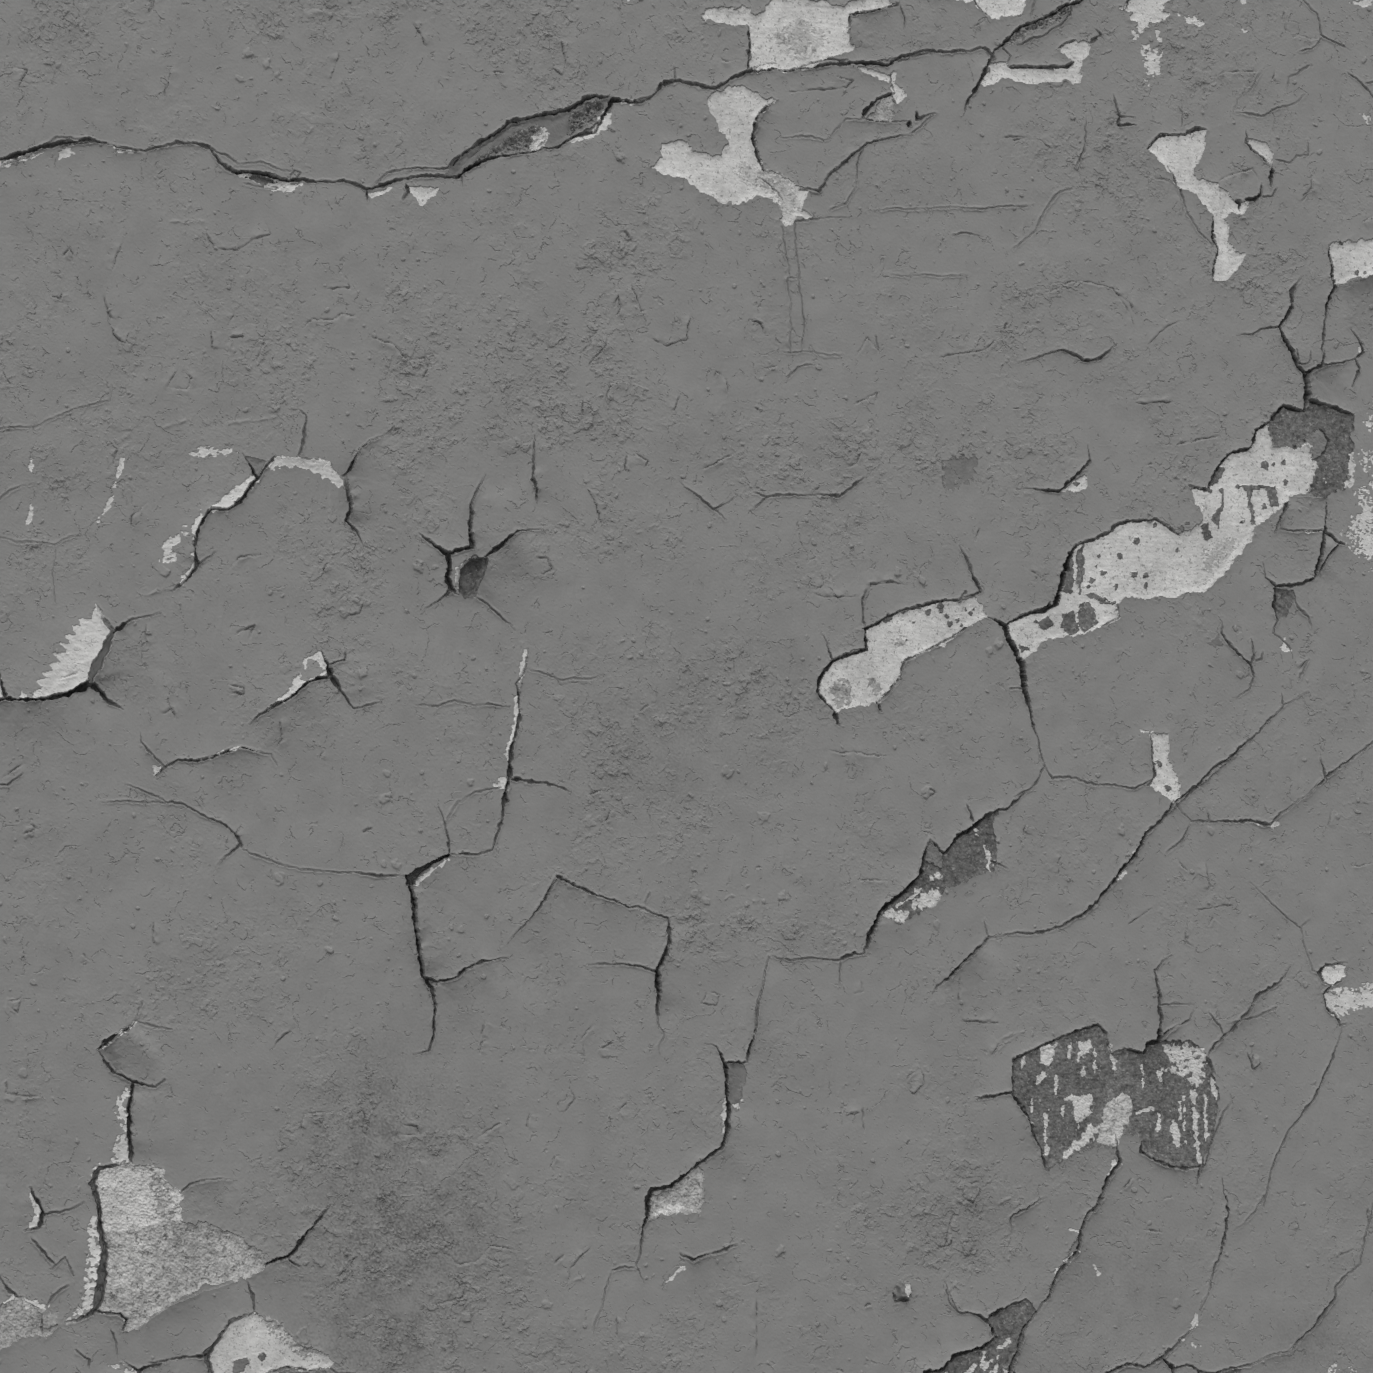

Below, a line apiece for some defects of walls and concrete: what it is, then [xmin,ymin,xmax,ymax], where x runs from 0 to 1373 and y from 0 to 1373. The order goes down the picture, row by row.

crack [0,0,1083,206]
peeling [651,0,907,227]
peeling [1148,128,1309,282]
peeling [0,604,161,755]
crack [102,648,695,1055]
peeling [816,546,987,726]
peeling [772,730,1181,985]
crack [932,618,1373,995]
peeling [1004,402,1355,661]
peeling [0,1002,336,1373]
crack [593,957,770,1334]
peeling [977,955,1233,1186]